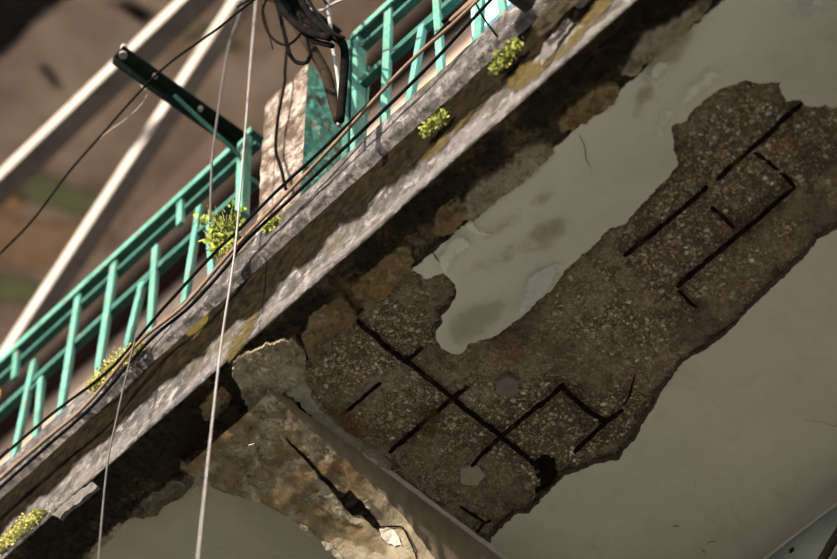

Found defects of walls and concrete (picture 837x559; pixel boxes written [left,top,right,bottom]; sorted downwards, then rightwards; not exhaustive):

spalling [284,80,837,542]
peeling [52,482,100,521]
crack [285,437,417,559]
peeling [300,523,347,559]
peeling [379,527,402,546]